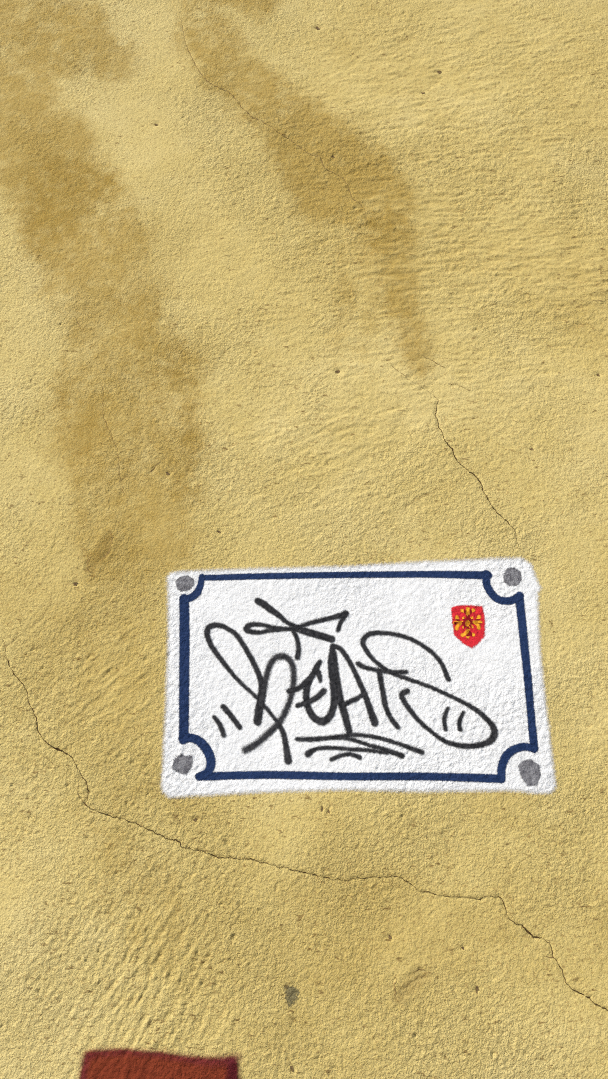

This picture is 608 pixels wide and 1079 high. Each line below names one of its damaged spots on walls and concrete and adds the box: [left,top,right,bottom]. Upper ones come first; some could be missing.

crack [393,359,519,545]
crack [2,594,608,1011]